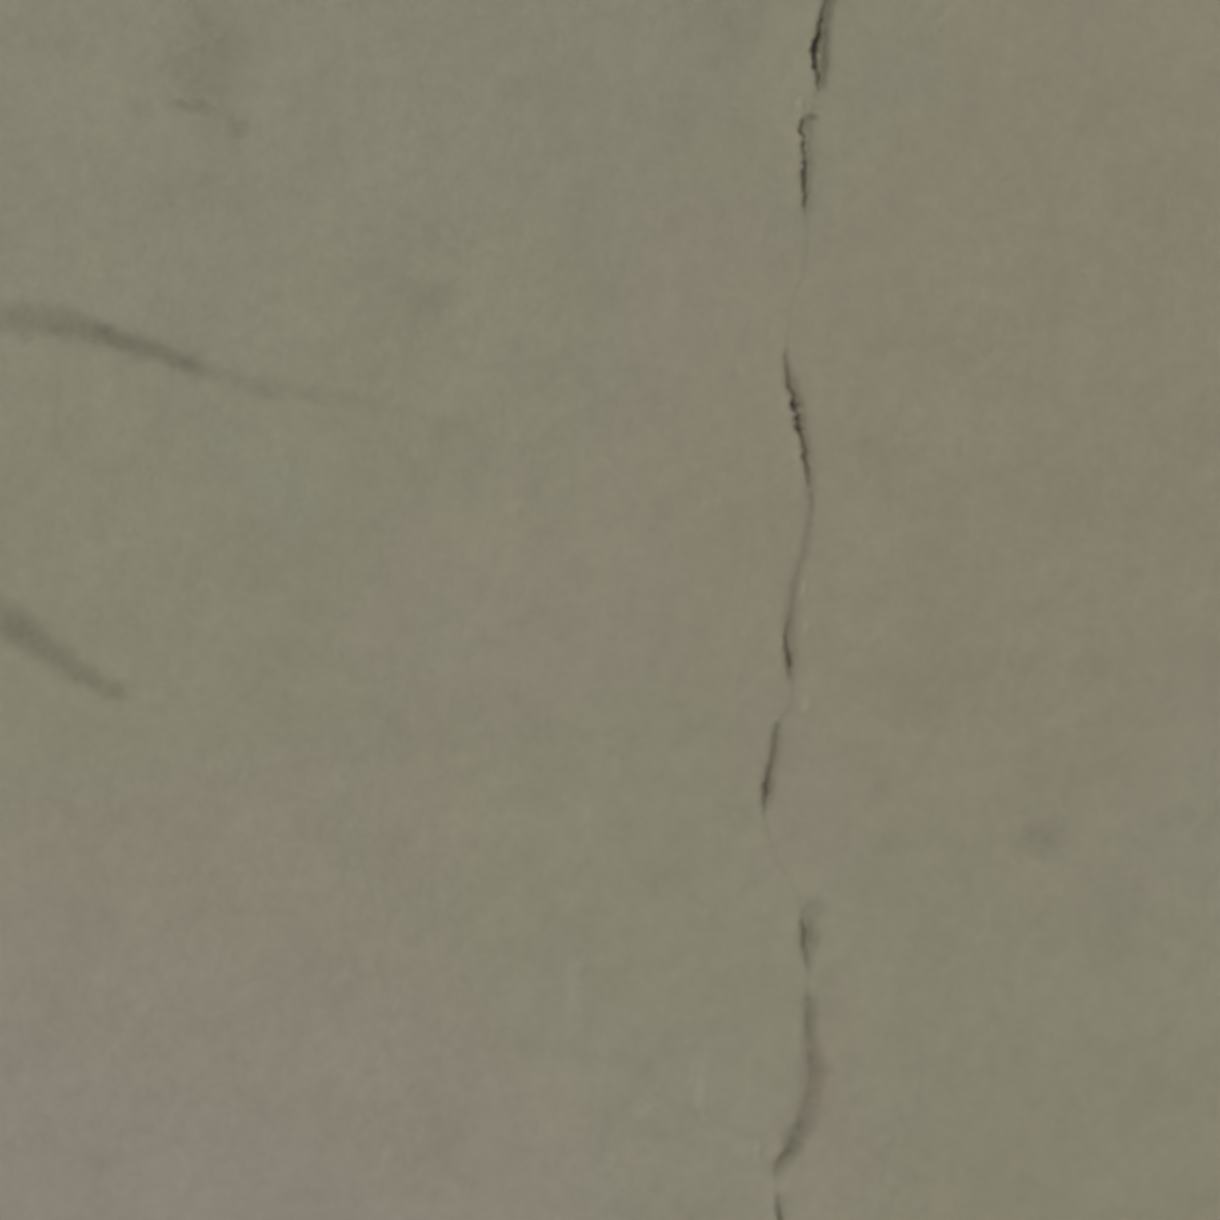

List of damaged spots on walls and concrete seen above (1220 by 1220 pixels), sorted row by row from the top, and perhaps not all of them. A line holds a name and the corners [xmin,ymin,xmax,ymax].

crack [796,0,827,212]
crack [783,357,811,489]
crack [762,580,816,811]
crack [799,914,819,966]
crack [755,1137,794,1220]